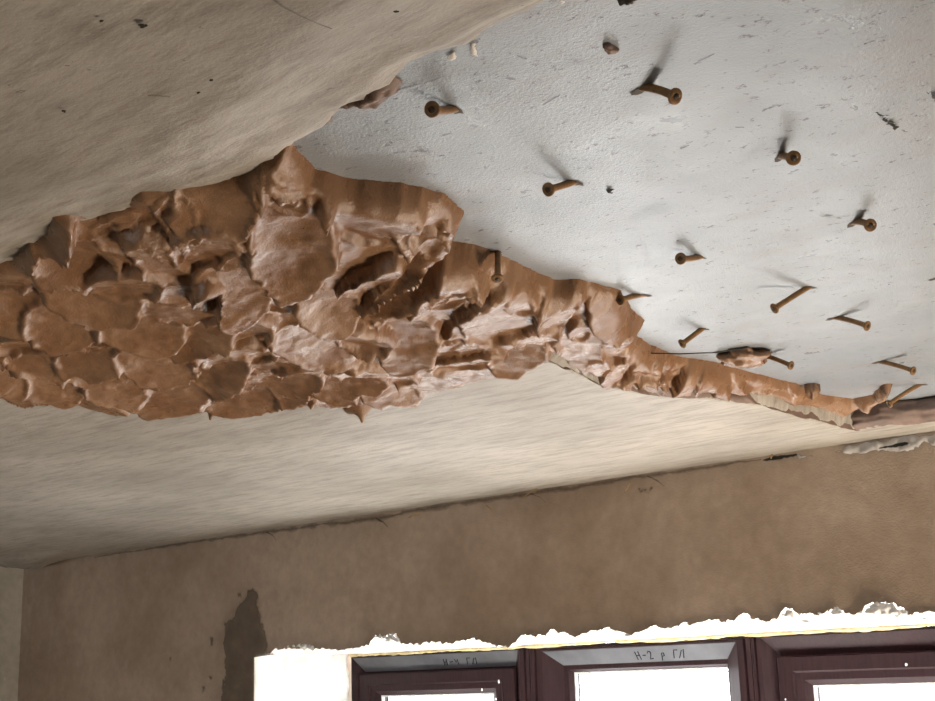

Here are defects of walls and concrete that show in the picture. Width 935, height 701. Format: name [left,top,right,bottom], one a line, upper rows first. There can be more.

flaking render [340,77,411,110]
spalling [837,433,935,454]